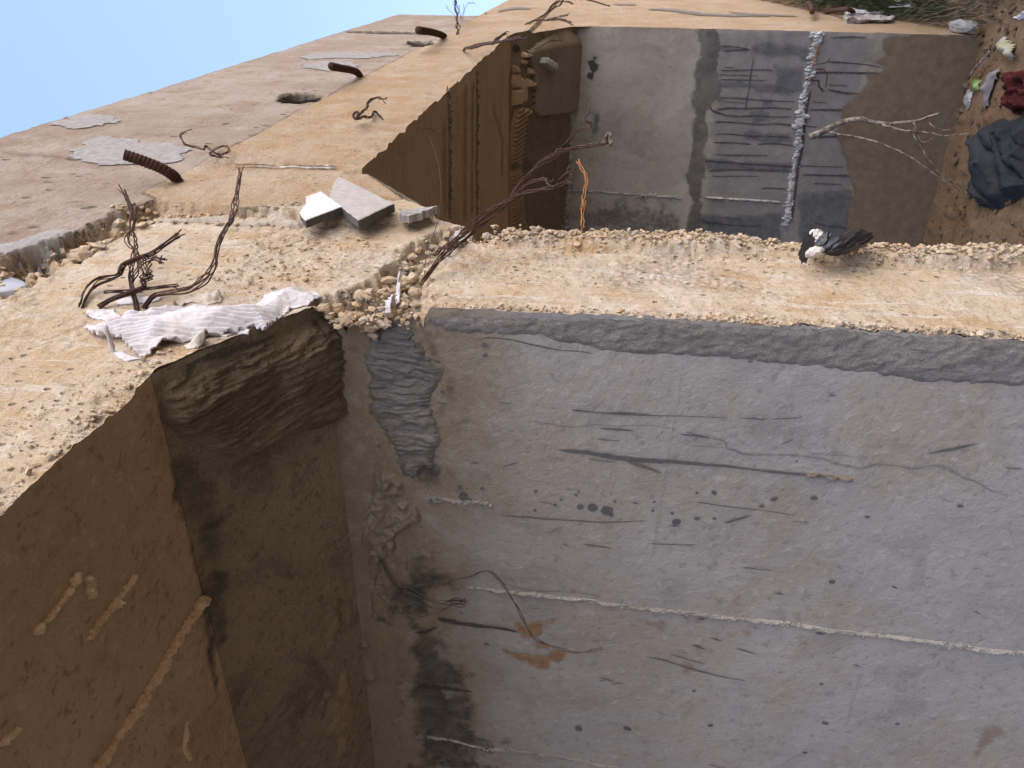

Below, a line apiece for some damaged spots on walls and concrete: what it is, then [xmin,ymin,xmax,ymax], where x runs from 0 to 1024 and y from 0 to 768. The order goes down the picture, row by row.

spalling [277,93,322,104]
damp [580,29,882,243]
crack [530,421,1002,493]
damp [380,573,490,768]
rust [504,619,564,669]
damp [646,638,744,681]